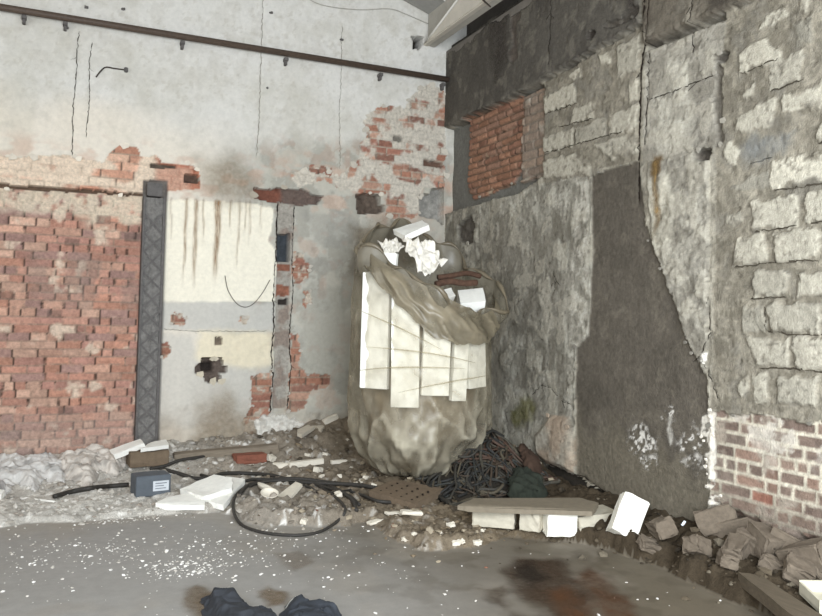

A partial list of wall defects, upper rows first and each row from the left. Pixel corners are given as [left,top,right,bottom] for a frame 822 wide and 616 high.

crack [634,0,712,201]
spalling [0,142,201,197]
spalling [281,82,450,219]
rust [651,157,662,221]
spalling [276,233,313,308]
spalling [195,356,228,385]
spalling [241,370,273,434]
spalling [282,331,331,429]
leakage [630,425,656,467]
spalling [540,160,822,586]
leakage [668,410,701,460]
crack [696,302,718,398]